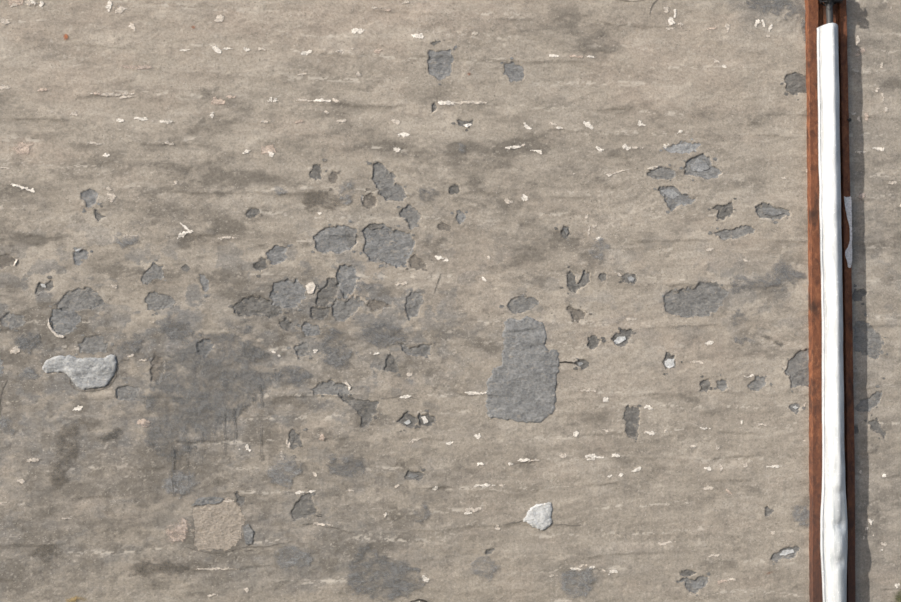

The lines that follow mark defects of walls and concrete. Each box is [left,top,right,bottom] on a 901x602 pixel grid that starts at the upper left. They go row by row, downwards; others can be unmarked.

spalling [411,33,457,85]
spalling [647,130,722,213]
spalling [309,159,427,271]
spalling [35,276,54,296]
spalling [47,287,114,356]
spalling [228,244,424,331]
spalling [662,281,729,318]
spalling [852,284,888,359]
damp [145,316,311,495]
spalling [622,405,667,442]